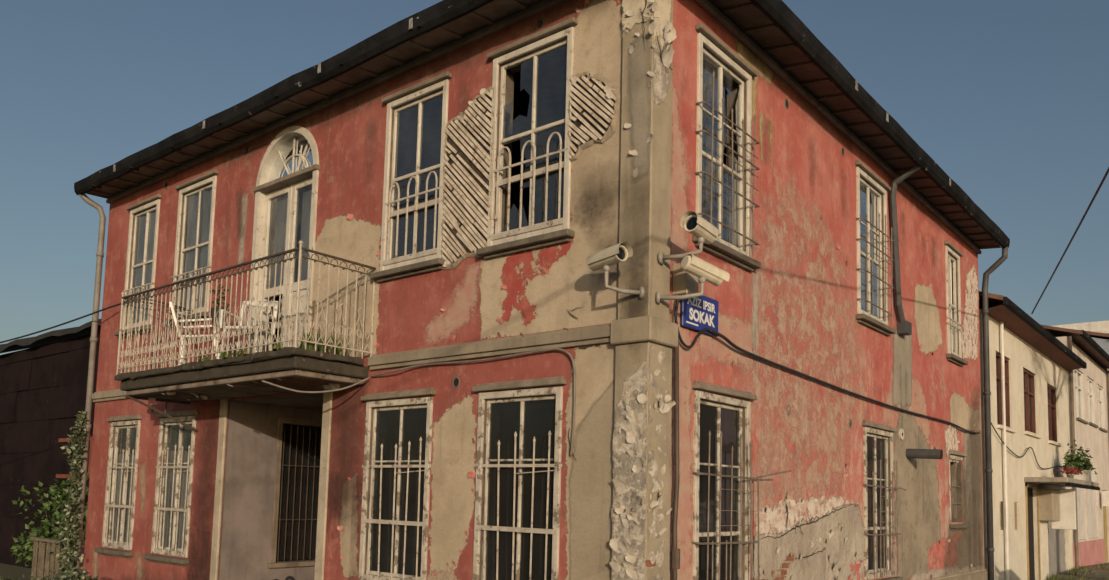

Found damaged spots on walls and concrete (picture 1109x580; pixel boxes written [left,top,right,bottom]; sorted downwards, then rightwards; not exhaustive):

flaking render [427,0,691,344]
flaking render [310,214,382,357]
peeling [563,190,865,580]
flaking render [914,283,945,357]
flaking render [427,393,477,580]
crack [762,491,846,579]